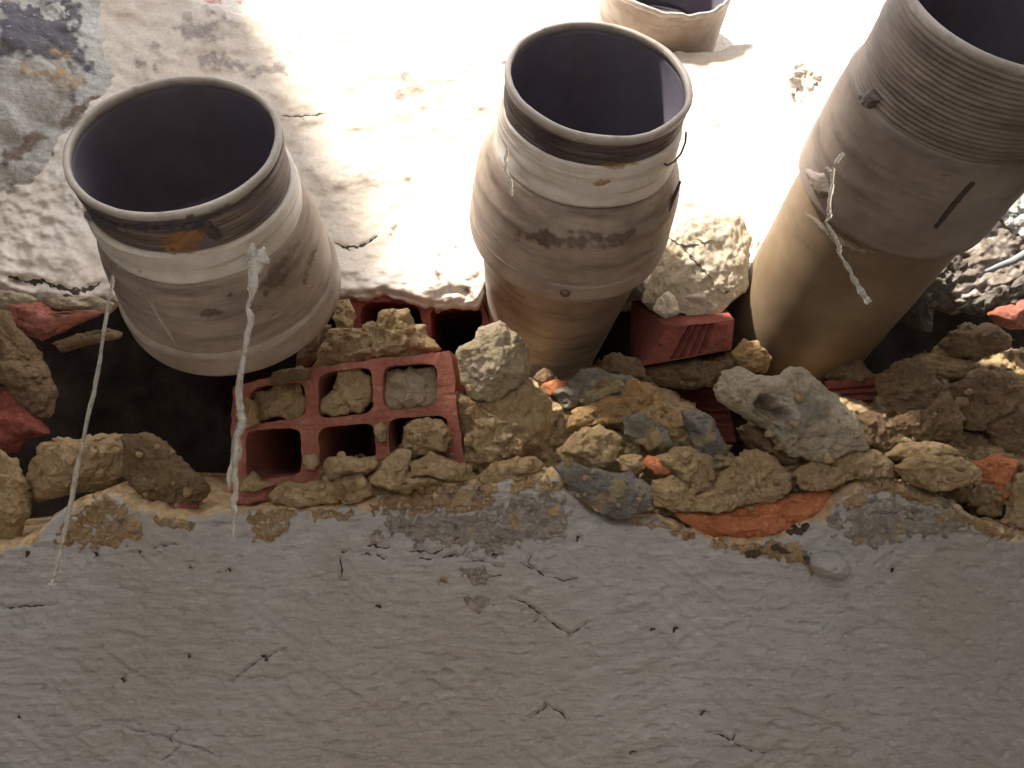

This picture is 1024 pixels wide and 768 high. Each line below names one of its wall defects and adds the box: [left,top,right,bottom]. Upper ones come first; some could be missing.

peeling [39,2,70,20]
crack [283,113,326,121]
crack [336,236,377,251]
crack [8,275,100,297]
spalling [53,493,196,558]
spalling [246,507,297,543]
spalling [311,475,580,614]
crack [340,544,578,582]
spalling [632,519,695,541]
spalling [710,537,815,576]
spalling [826,478,1024,549]
crack [516,599,587,635]